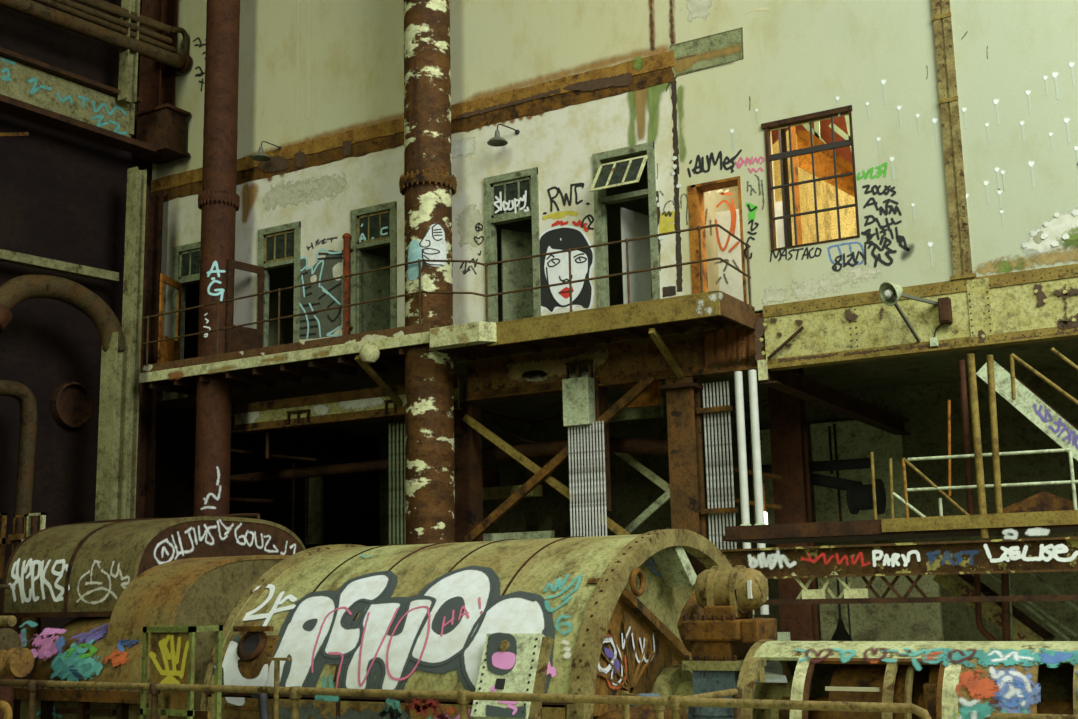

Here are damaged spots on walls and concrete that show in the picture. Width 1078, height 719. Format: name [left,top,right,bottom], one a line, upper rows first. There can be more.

corrosion [457,0,675,132]
damp [628,46,740,146]
peeling [262,173,347,211]
corrosion [255,114,404,181]